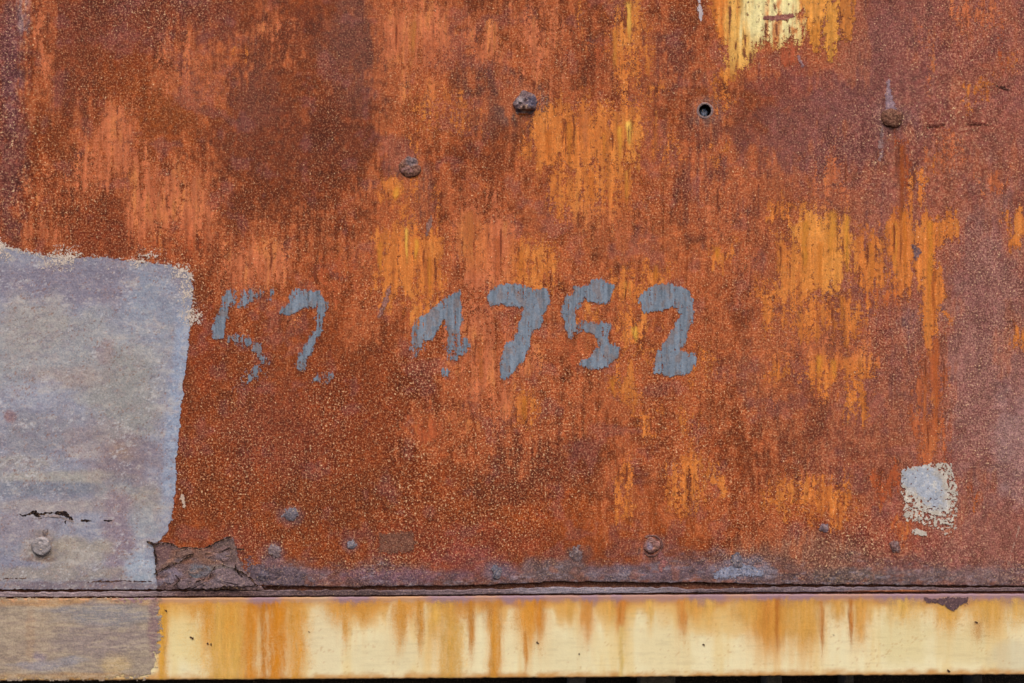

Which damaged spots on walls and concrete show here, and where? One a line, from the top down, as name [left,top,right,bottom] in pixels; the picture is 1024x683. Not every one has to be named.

rust [15,0,1024,533]
crack [20,510,112,524]
rust [756,457,922,552]
rust [146,536,720,680]
rust [818,595,1024,666]
peeling [924,596,968,612]